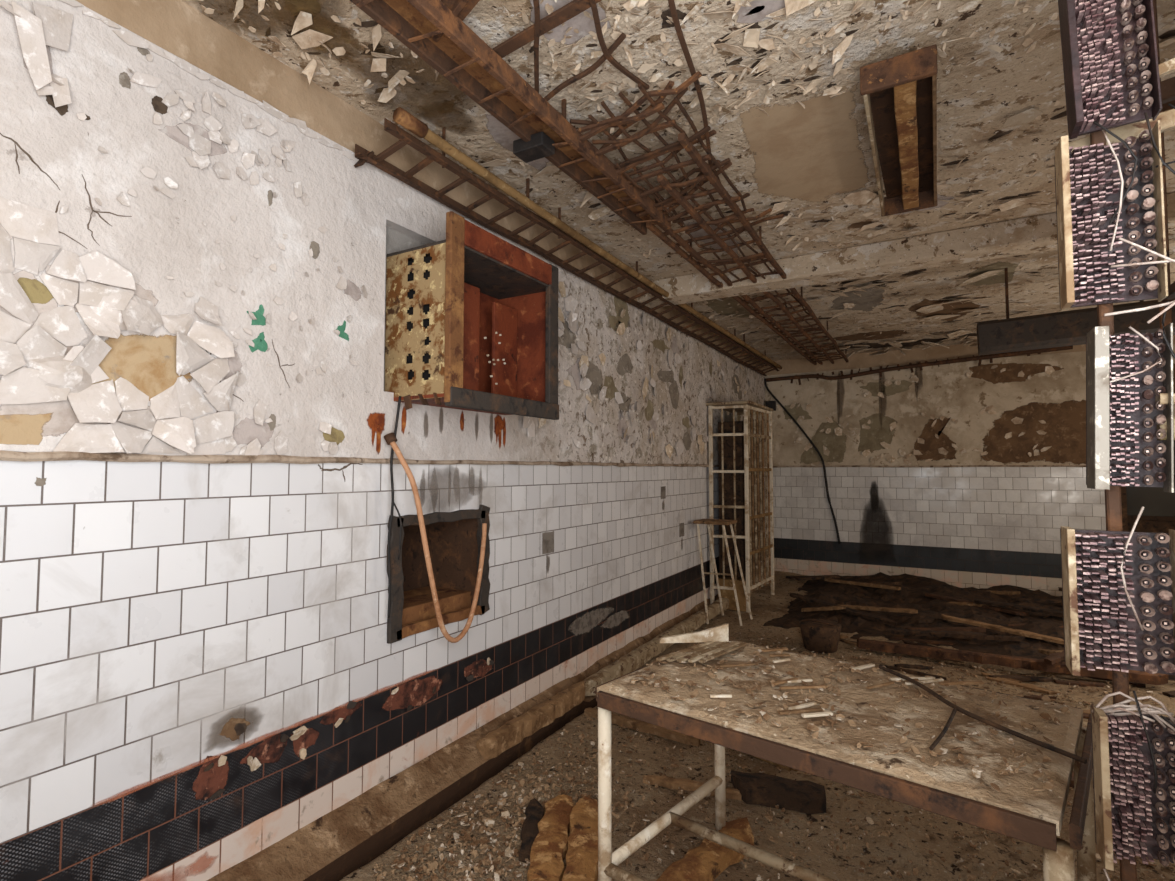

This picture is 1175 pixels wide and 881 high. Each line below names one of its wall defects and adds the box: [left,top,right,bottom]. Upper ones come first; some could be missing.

peeling [11,0,439,207]
peeling [481,0,1068,266]
crack [0,133,132,249]
peeling [0,197,315,455]
peeling [703,254,1043,358]
rust [367,412,385,454]
rust [424,409,443,435]
rust [460,411,506,448]
flaking render [776,400,1086,466]
water stain [420,470,482,512]
spalling [192,701,362,801]
rust [146,855,214,881]